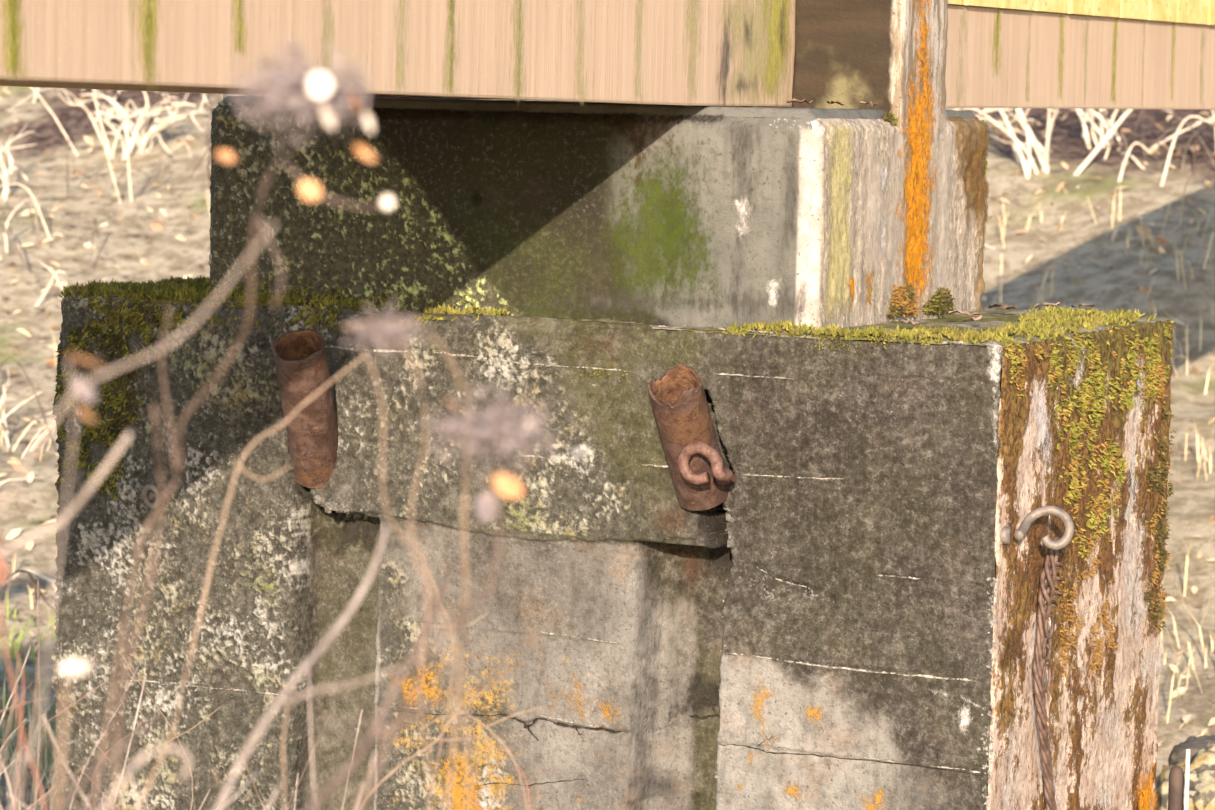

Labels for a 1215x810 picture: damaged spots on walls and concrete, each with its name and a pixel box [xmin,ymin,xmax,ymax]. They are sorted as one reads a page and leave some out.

leakage [731,130,751,234]
leakage [734,282,802,314]
crack [390,706,628,741]